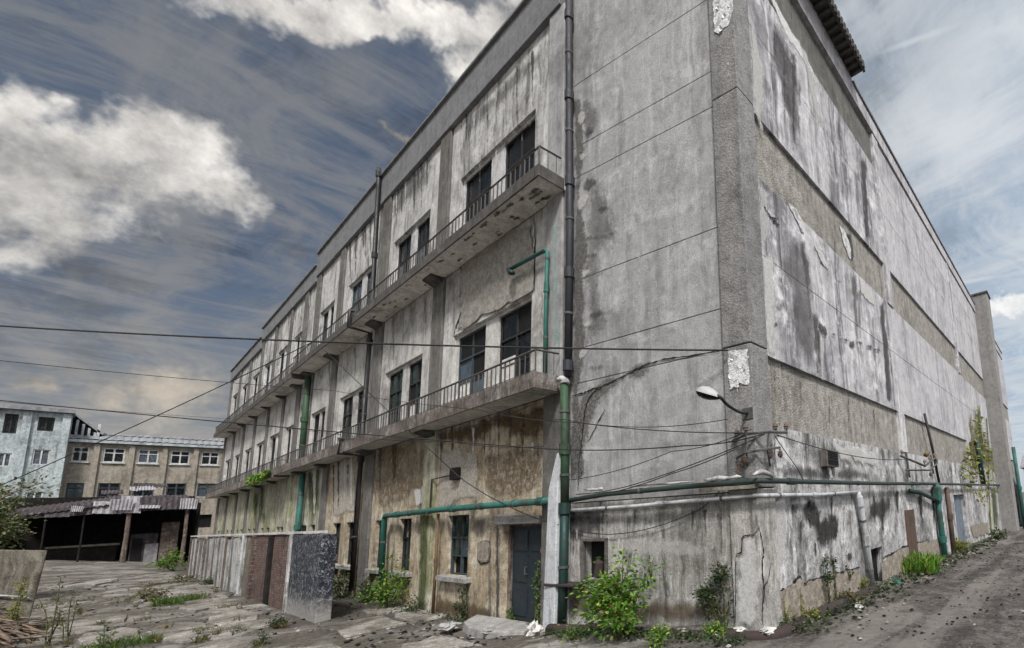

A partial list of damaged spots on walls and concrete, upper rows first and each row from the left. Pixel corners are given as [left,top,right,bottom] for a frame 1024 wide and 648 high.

peeling [713,0,733,34]
damp [772,0,819,137]
damp [861,160,869,237]
peeling [840,226,854,260]
damp [763,256,776,354]
peeling [728,349,750,389]
damp [880,303,891,400]
damp [440,408,544,470]
crack [573,351,720,484]
damp [775,437,877,478]
damp [776,496,845,572]
crack [735,527,771,624]